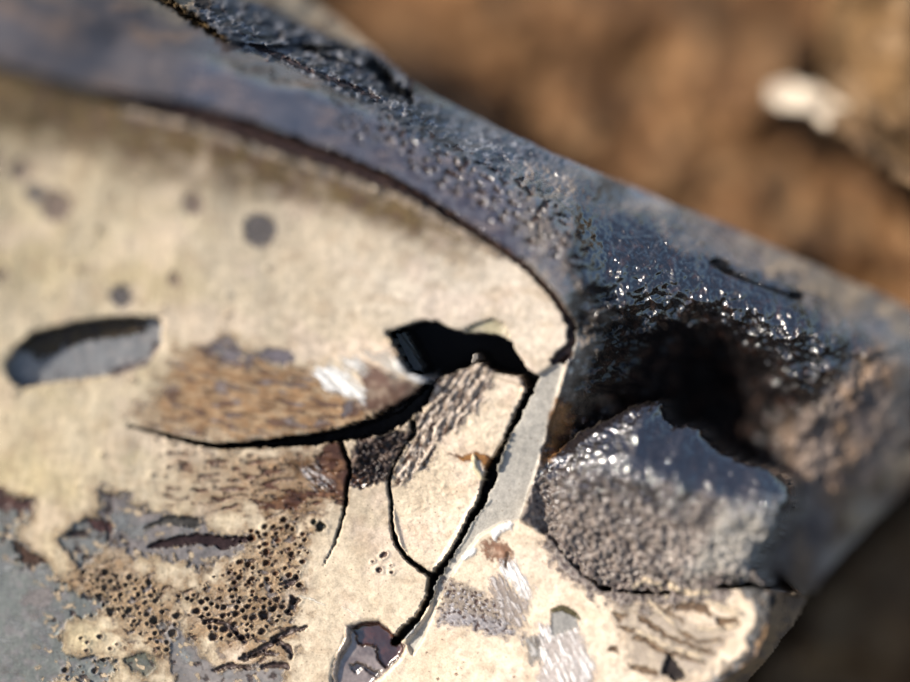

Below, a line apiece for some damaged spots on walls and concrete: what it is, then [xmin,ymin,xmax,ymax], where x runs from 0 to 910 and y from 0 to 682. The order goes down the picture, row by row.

crack [155,0,415,104]
crack [101,90,576,365]
spalling [6,315,162,389]
peeling [0,483,309,682]
corrosion [54,347,424,675]
crack [128,374,535,645]
peeling [430,499,523,639]